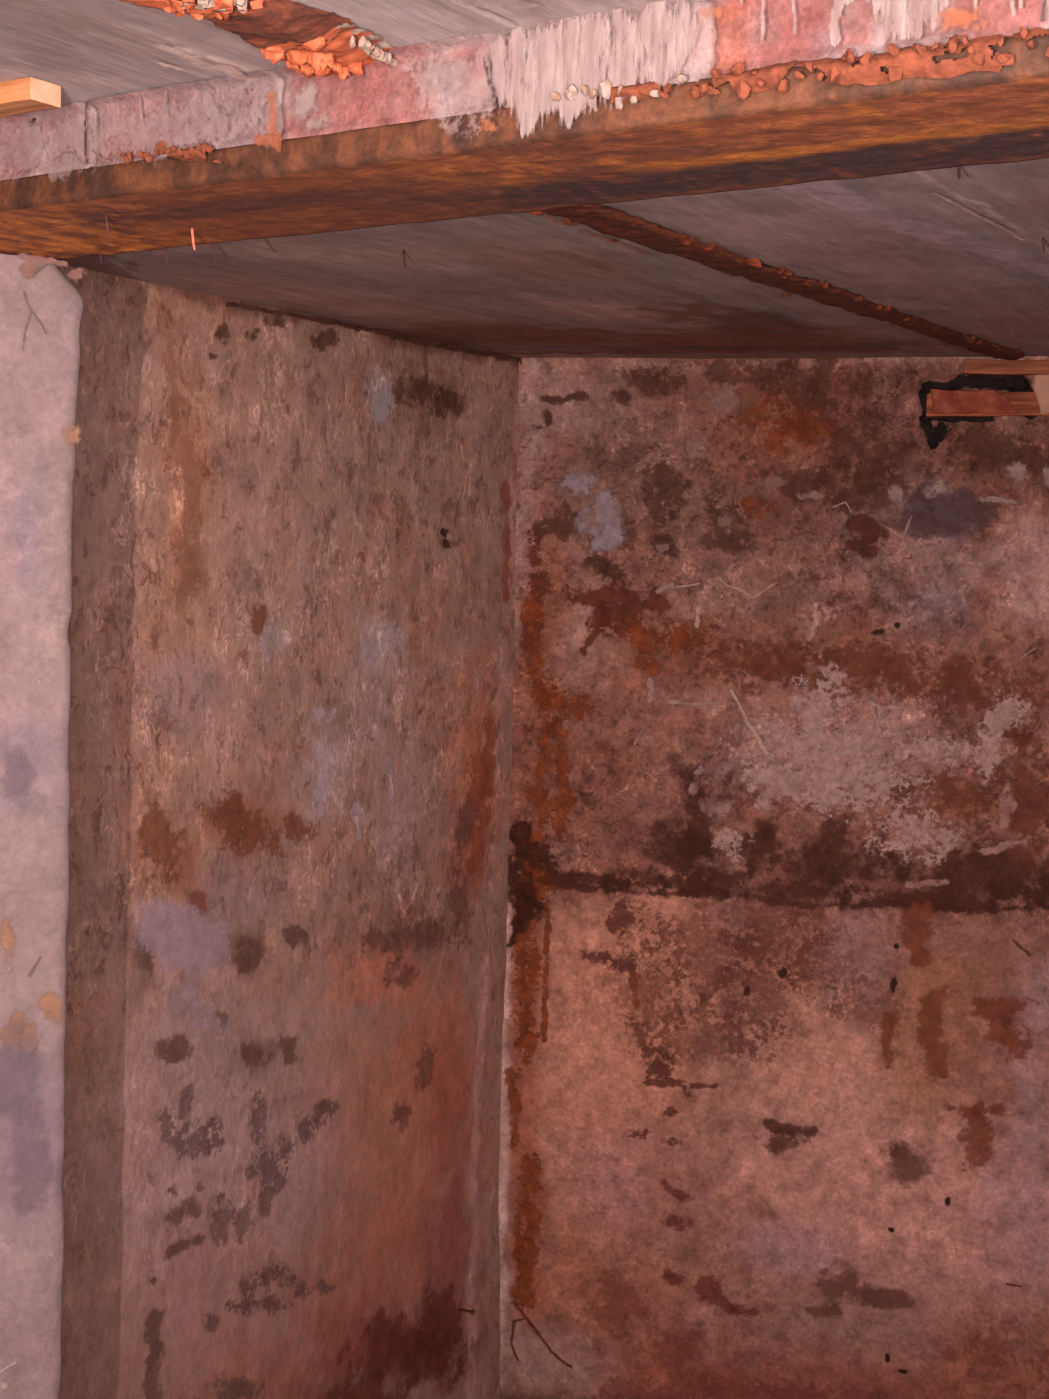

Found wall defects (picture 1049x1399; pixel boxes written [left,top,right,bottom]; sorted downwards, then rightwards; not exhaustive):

water stain [828,0,949,47]
corrosion [939,8,986,31]
water stain [451,0,707,138]
corrosion [254,90,283,151]
corrosion [583,204,910,321]
corrosion [465,711,496,874]
water stain [540,663,1049,935]
corrosion [500,482,1049,1309]
water stain [283,925,309,950]
water stain [578,950,637,974]
water stain [240,1036,297,1066]
water stain [641,1044,718,1116]